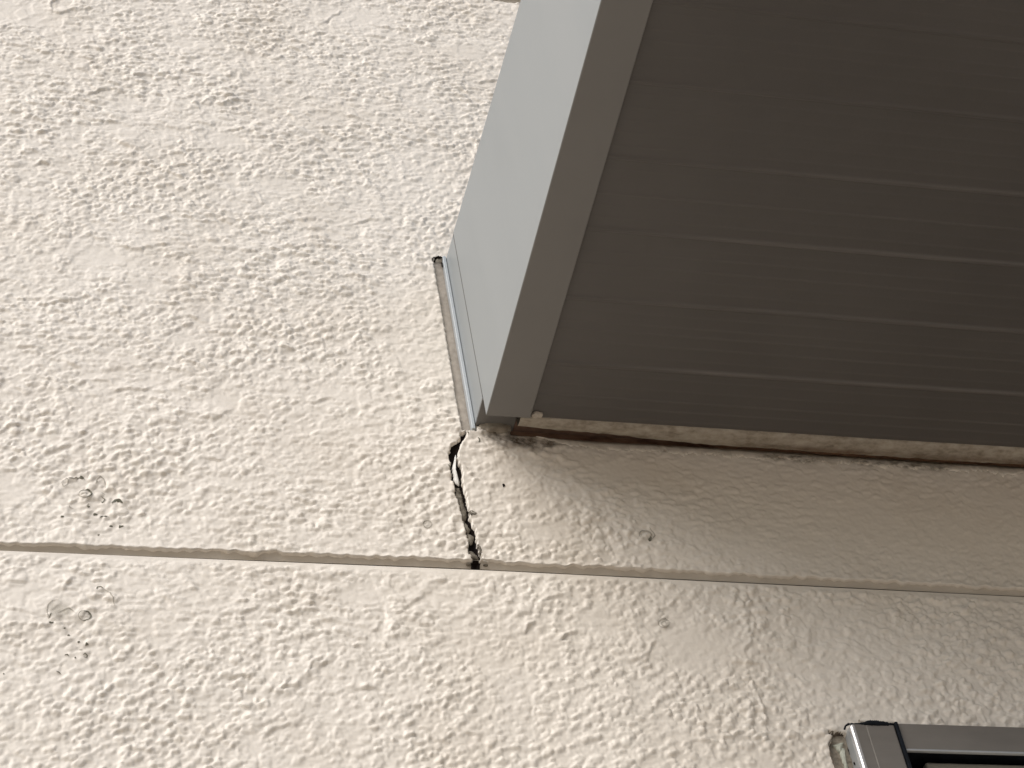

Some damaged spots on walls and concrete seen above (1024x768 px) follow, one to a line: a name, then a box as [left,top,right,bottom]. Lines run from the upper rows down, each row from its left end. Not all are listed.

crack [448,432,489,570]